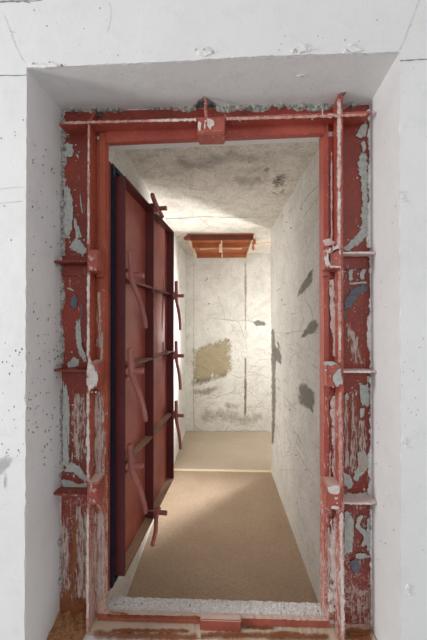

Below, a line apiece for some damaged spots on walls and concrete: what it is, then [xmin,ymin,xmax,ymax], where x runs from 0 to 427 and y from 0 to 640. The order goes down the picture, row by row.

peeling [27,272,98,487]
leakage [194,338,231,382]
crack [192,265,317,456]
leakage [271,329,281,443]
leakage [285,385,314,411]
leakage [298,271,312,296]
leakage [301,302,318,337]
peeling [324,279,343,387]
peeling [343,269,367,320]
peeling [345,376,370,418]
peeling [326,518,336,613]
peeling [328,450,371,598]